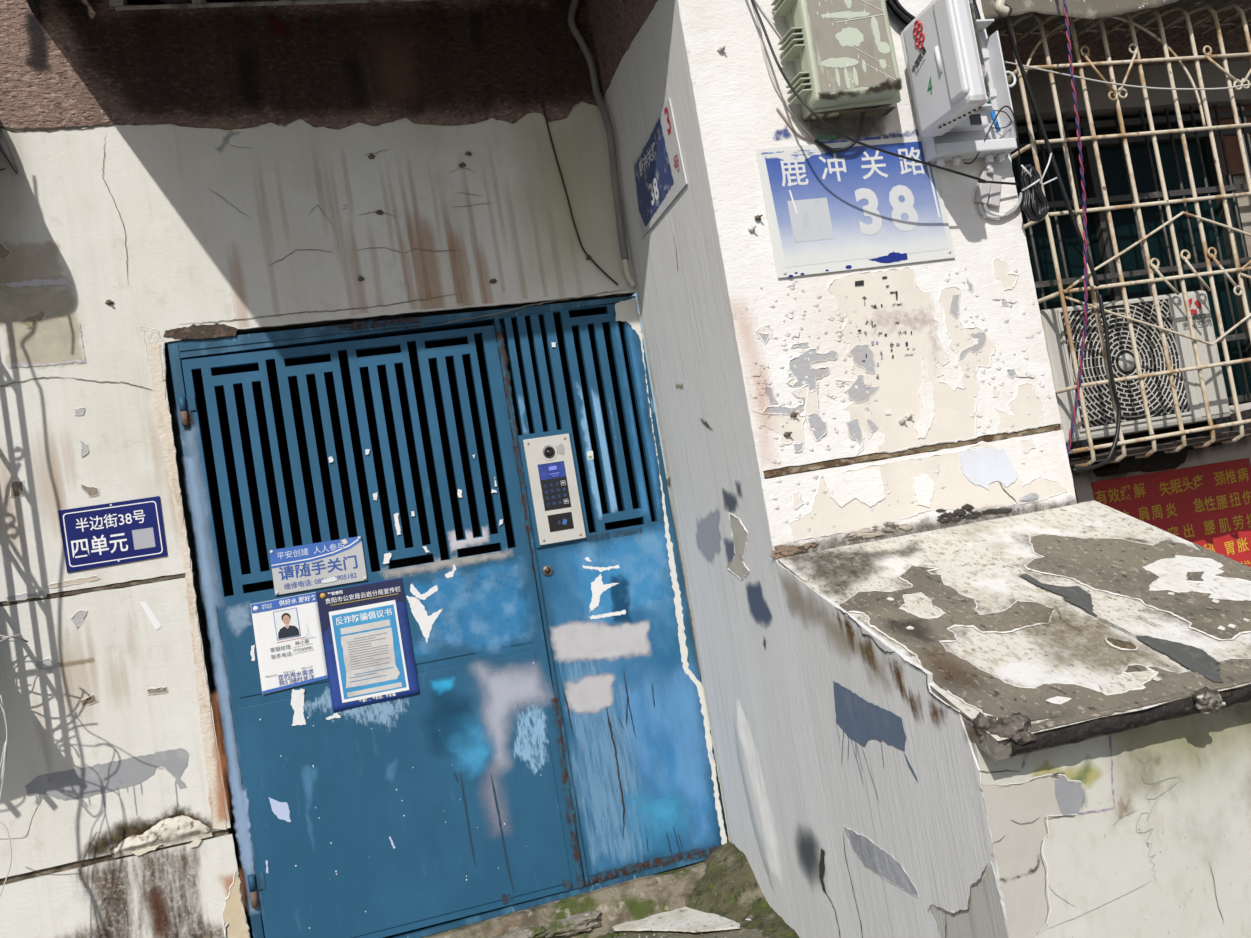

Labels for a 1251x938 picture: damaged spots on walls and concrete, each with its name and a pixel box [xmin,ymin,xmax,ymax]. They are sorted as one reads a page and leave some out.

crack [0,124,128,280]
peeling [752,257,1067,559]
peeling [727,512,750,581]
peeling [1024,533,1251,640]
peeling [839,565,1251,745]
crack [981,770,1074,787]
leakage [77,810,214,938]
leakage [143,851,227,938]
spalling [222,779,253,938]
crack [927,816,1075,938]